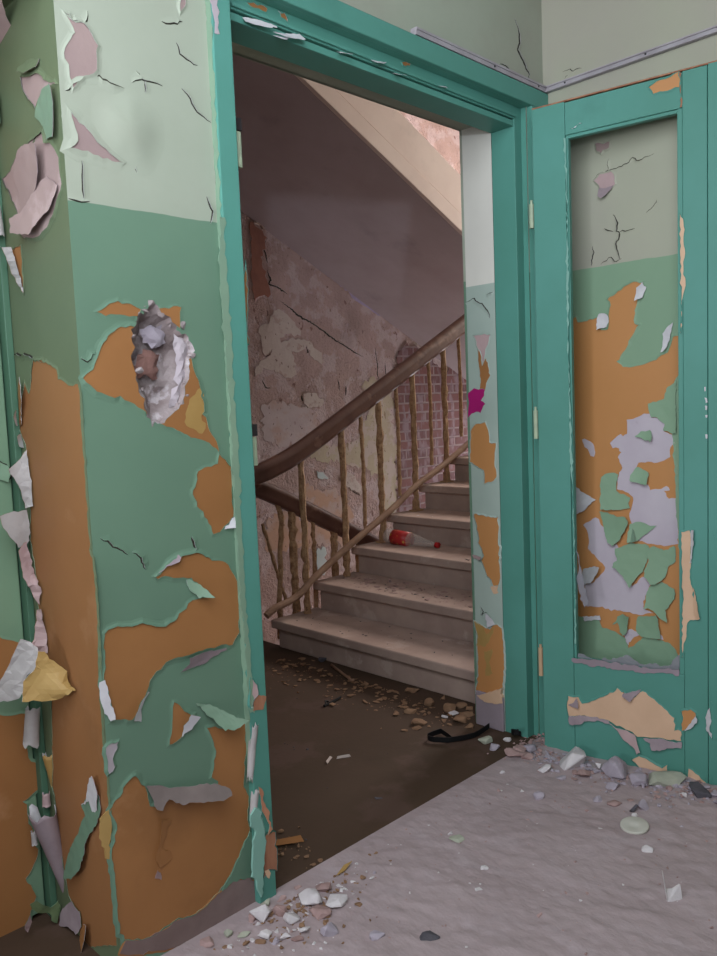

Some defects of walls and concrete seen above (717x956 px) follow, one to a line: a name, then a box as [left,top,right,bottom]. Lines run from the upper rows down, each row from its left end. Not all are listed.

peeling [242,1,305,40]
crack [499,17,532,79]
crack [594,153,655,179]
crack [589,199,659,266]
crack [263,239,387,396]
peeling [0,0,278,956]
peeling [259,391,324,448]
peeling [305,359,498,523]
peeling [563,123,701,666]
peeling [262,510,343,576]
peeling [472,512,502,594]
peeling [566,687,717,771]